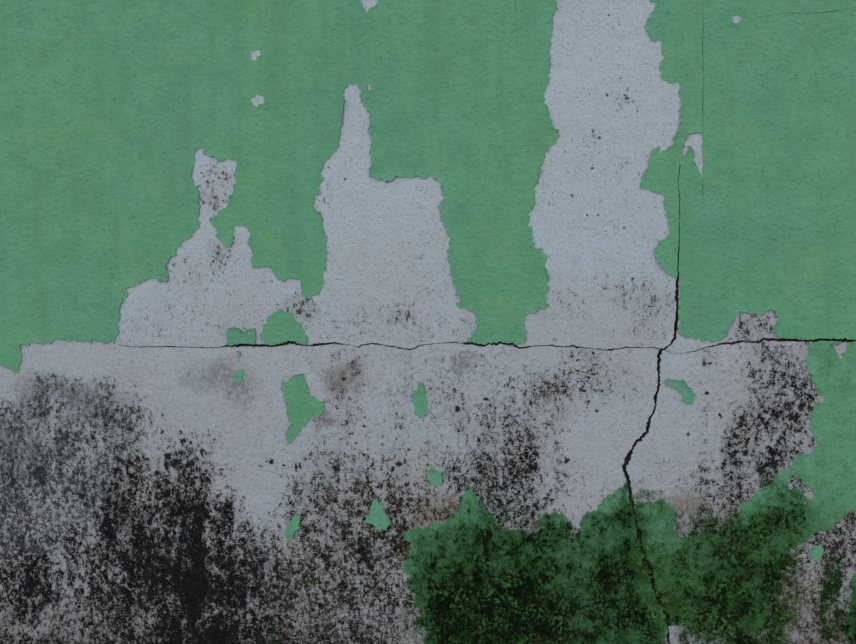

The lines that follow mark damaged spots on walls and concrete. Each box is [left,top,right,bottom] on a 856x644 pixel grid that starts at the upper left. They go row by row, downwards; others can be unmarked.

peeling [360,0,378,12]
water stain [0,350,611,644]
peeling [0,84,659,644]
crack [114,165,856,528]
peeling [517,0,826,538]
water stain [669,345,817,535]
peeling [665,508,856,644]
water stain [754,512,856,644]
peeling [830,342,848,360]